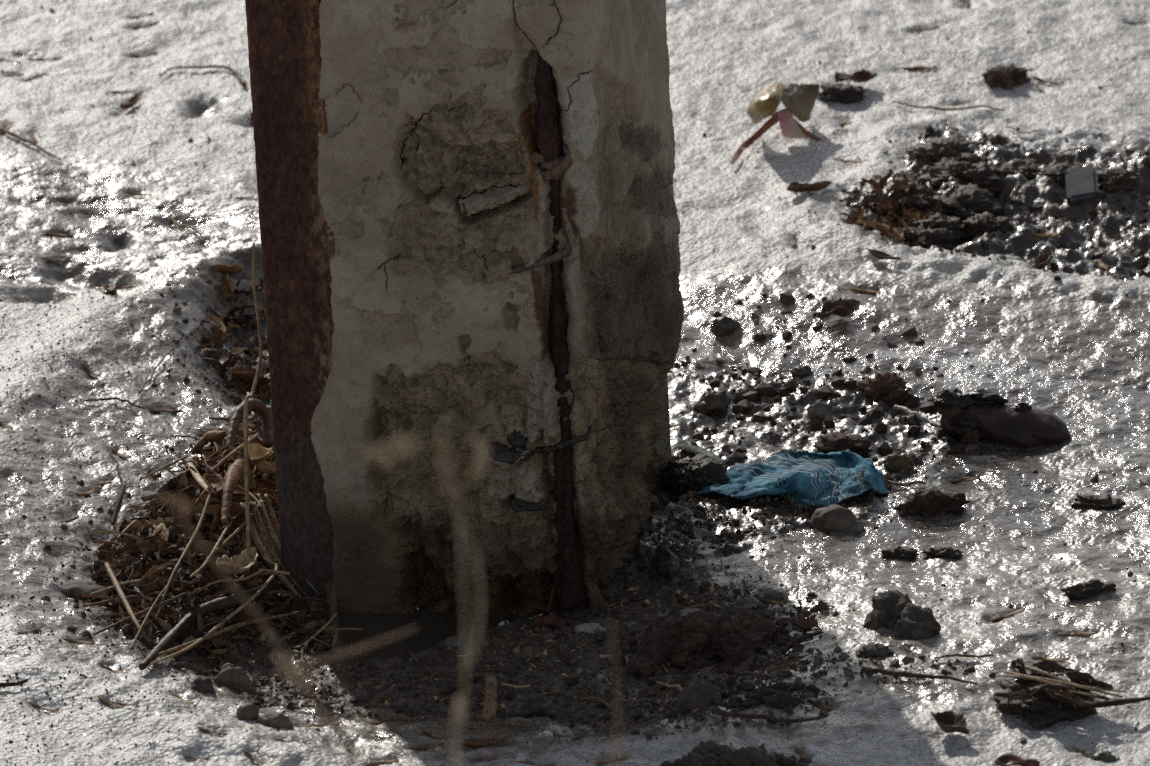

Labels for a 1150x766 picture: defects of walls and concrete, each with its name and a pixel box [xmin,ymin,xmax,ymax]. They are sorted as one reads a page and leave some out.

crack [512,0,562,50]
crack [564,65,596,112]
corrosion [519,102,540,219]
corrosion [563,186,580,238]
spalling [367,21,677,616]
corrosion [531,270,550,361]